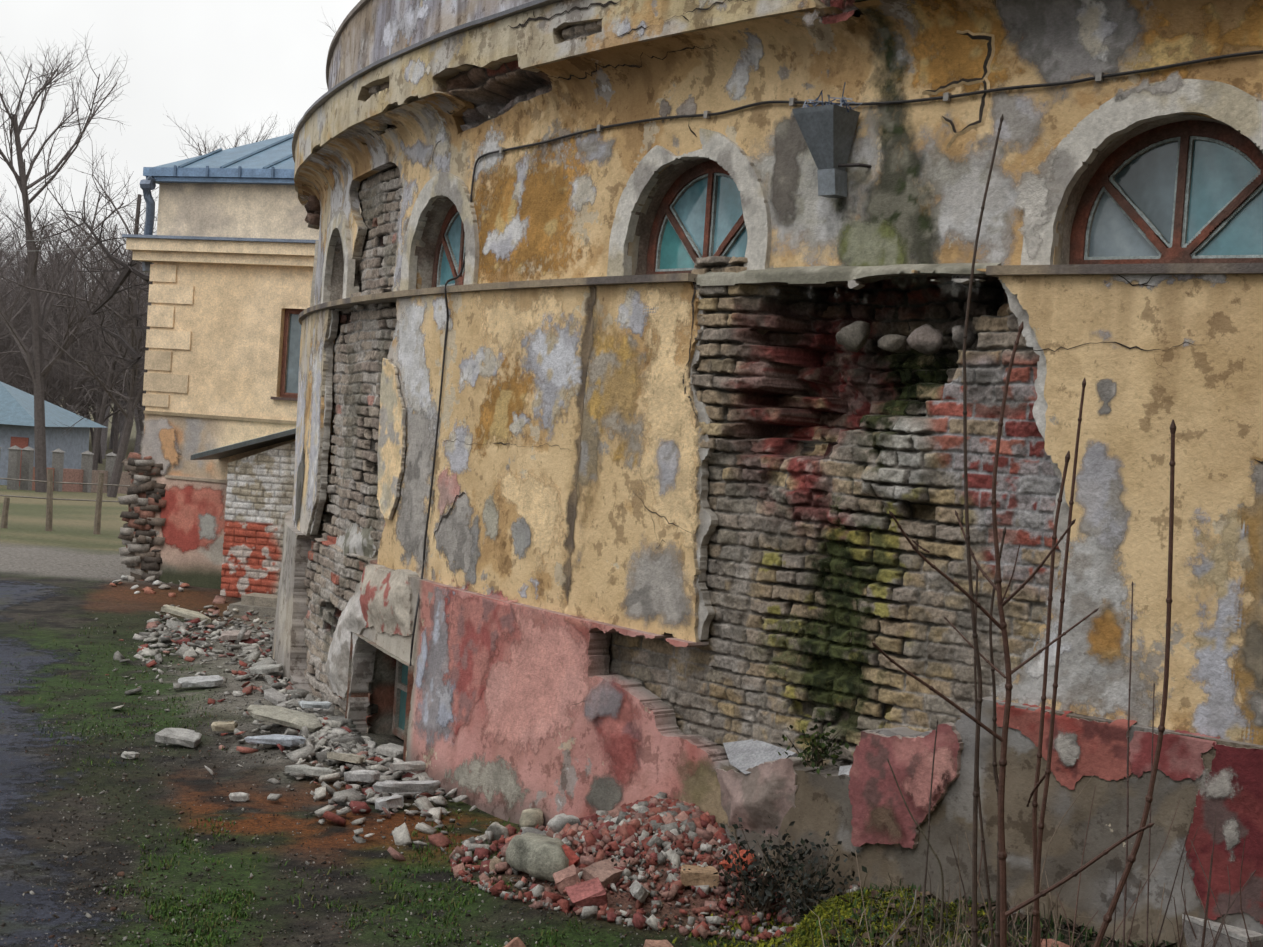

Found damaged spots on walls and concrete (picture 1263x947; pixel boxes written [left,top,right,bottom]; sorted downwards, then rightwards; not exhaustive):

peeling [381,0,428,55]
spalling [446,60,552,180]
crack [507,0,751,80]
water stain [750,0,1042,277]
crack [922,30,995,149]
peeling [483,150,537,260]
peeling [509,313,583,440]
crack [1028,342,1194,375]
spalling [109,428,225,597]
spalling [292,164,517,742]
flaking render [511,517,531,559]
spalling [609,256,1263,925]